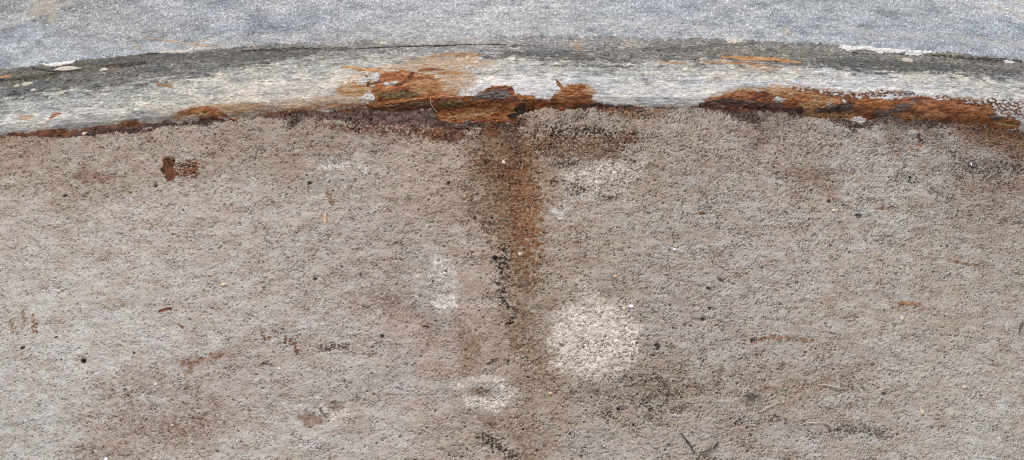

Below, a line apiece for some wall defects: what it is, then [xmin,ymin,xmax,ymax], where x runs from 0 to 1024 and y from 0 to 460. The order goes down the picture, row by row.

corrosion [703,56,801,75]
corrosion [792,87,915,99]
corrosion [830,95,1024,160]
corrosion [0,52,765,345]
efflorescence [545,274,647,386]